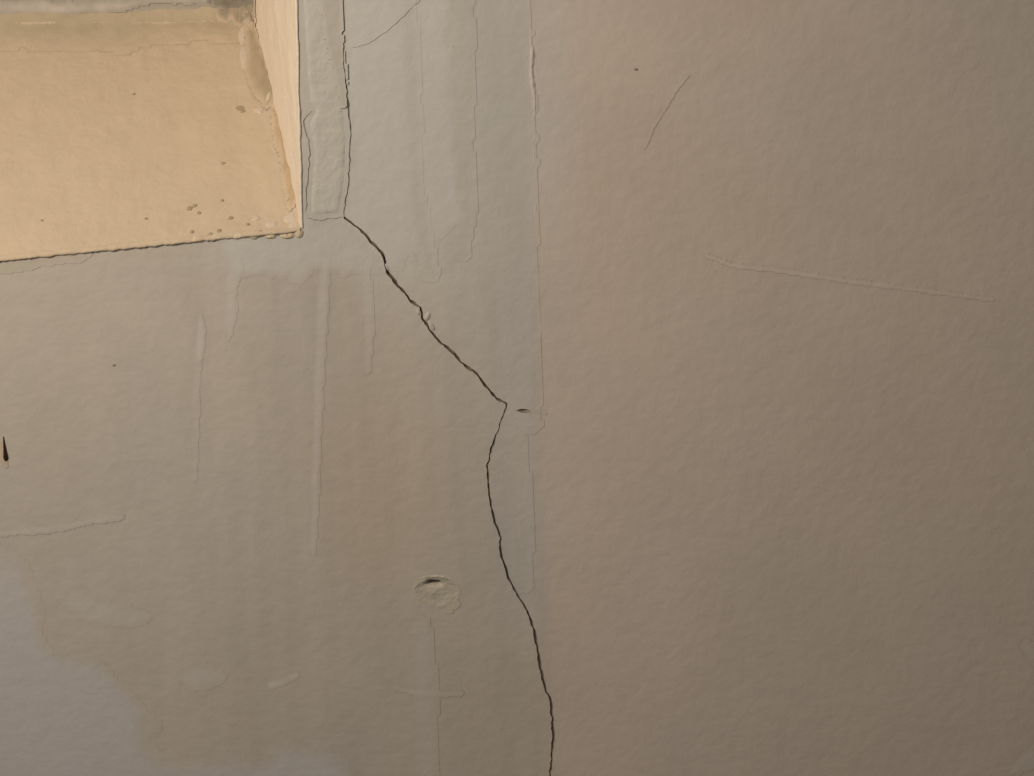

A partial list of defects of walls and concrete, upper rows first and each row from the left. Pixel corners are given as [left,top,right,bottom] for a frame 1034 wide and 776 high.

crack [303,1,555,776]